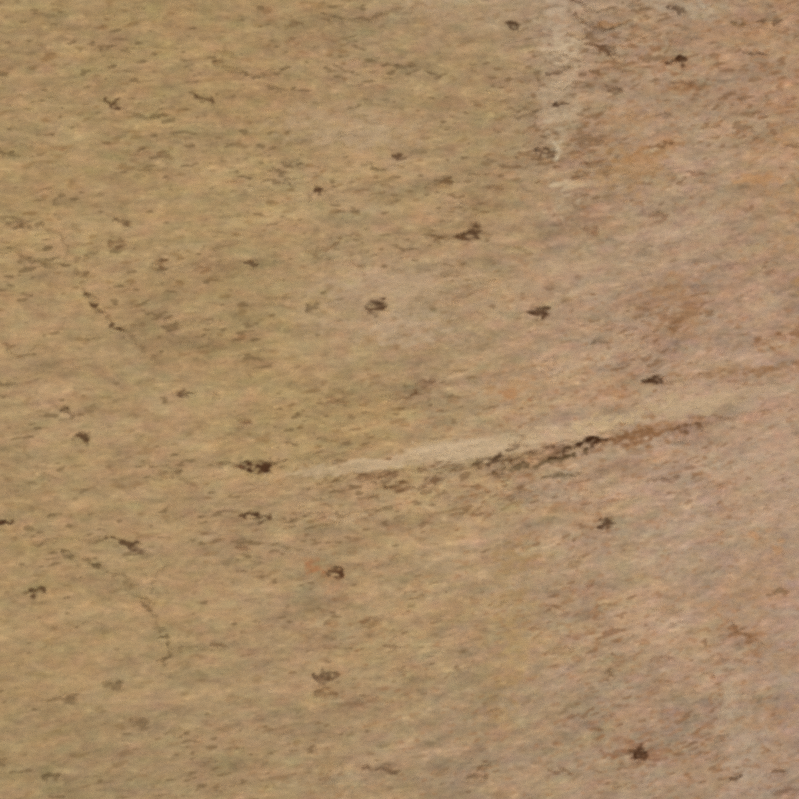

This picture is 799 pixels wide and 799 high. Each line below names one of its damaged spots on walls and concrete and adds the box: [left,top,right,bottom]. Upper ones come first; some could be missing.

crack [662,322,799,388]
crack [381,376,437,405]
crack [148,463,200,492]
crack [210,408,775,521]